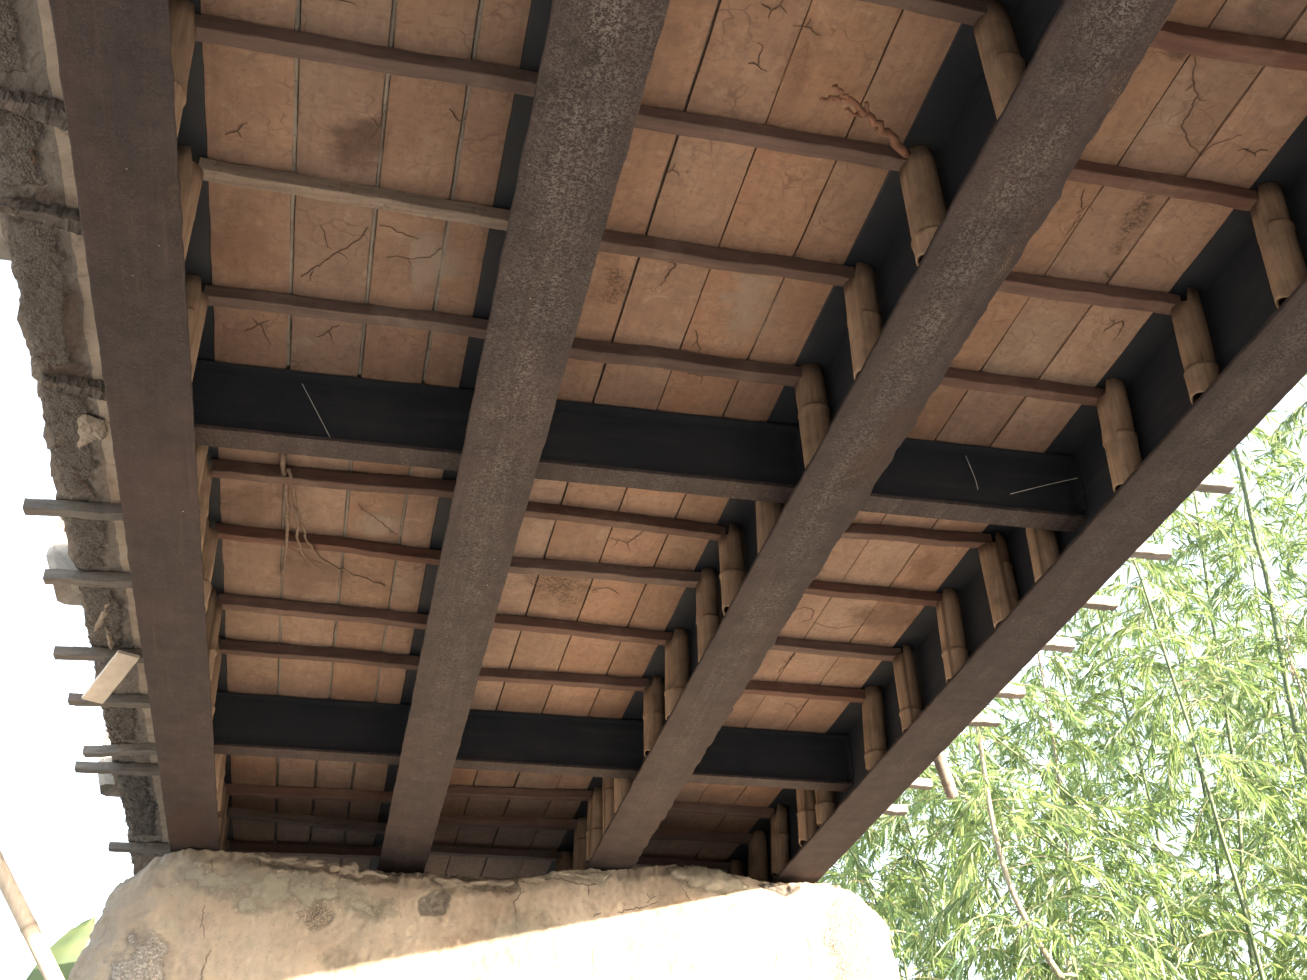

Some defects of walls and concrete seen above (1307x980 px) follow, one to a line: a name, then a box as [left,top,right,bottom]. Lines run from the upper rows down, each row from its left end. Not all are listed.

crack [748,0,818,71]
crack [1181,56,1268,158]
crack [301,225,441,280]